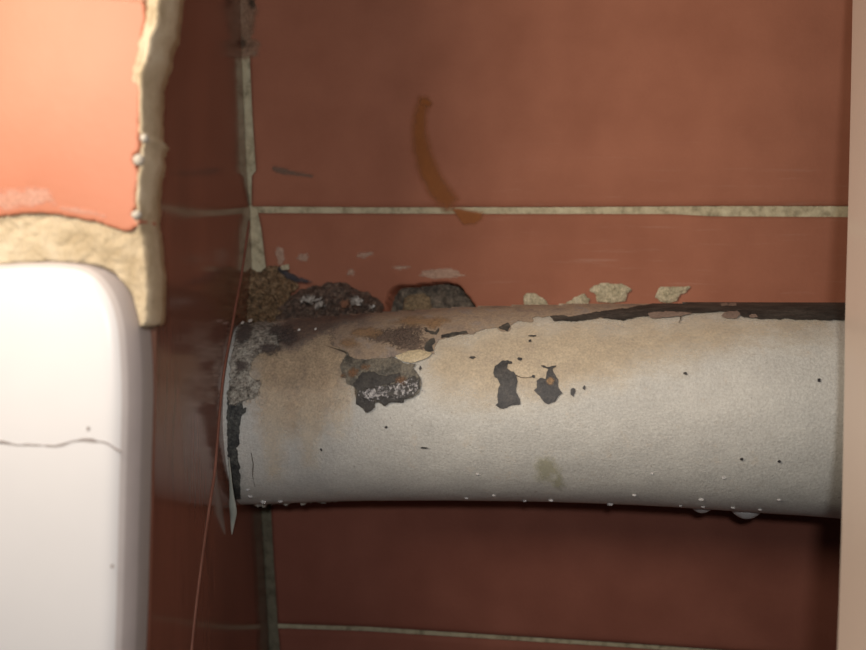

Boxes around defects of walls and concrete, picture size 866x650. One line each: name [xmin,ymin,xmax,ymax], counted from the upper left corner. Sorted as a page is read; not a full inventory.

rust [413,99,482,224]
rust [249,313,423,429]
peeling [493,357,586,409]
peeling [329,283,846,370]
peeling [226,397,246,500]